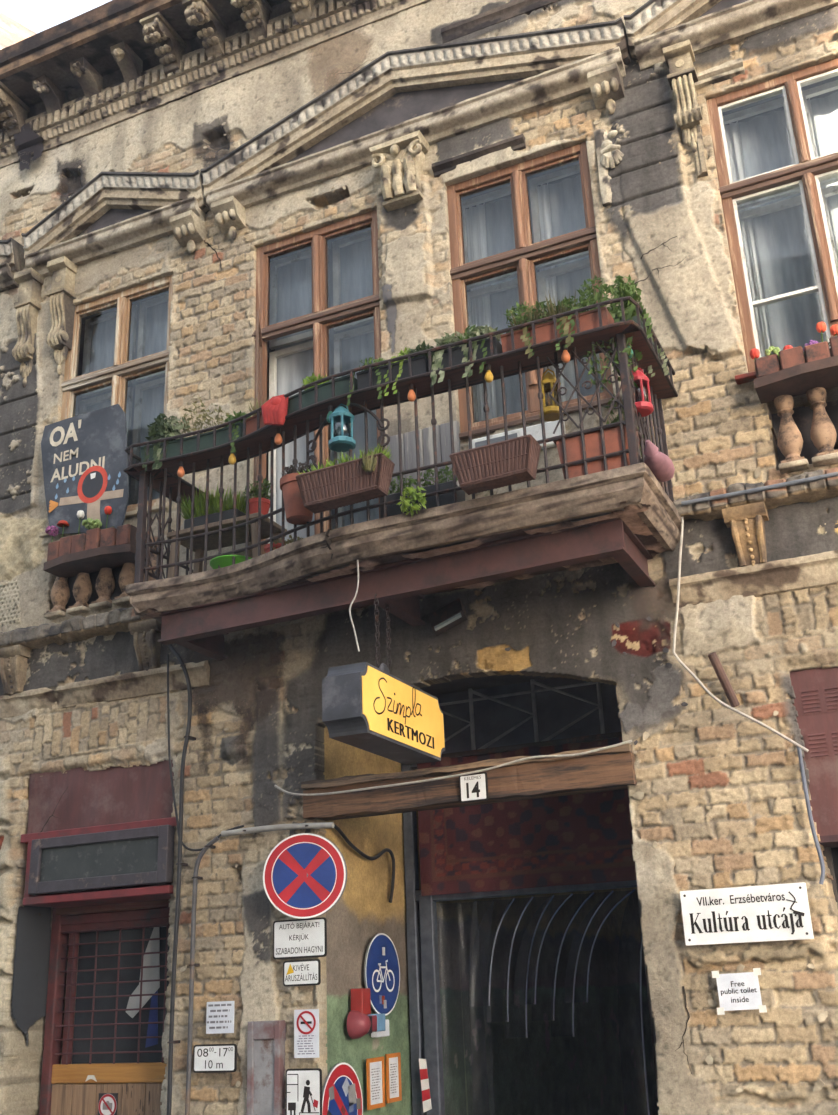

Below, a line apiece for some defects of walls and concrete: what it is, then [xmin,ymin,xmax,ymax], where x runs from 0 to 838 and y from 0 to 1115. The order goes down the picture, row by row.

peeling [477,642,532,671]
flaking render [612,616,821,890]